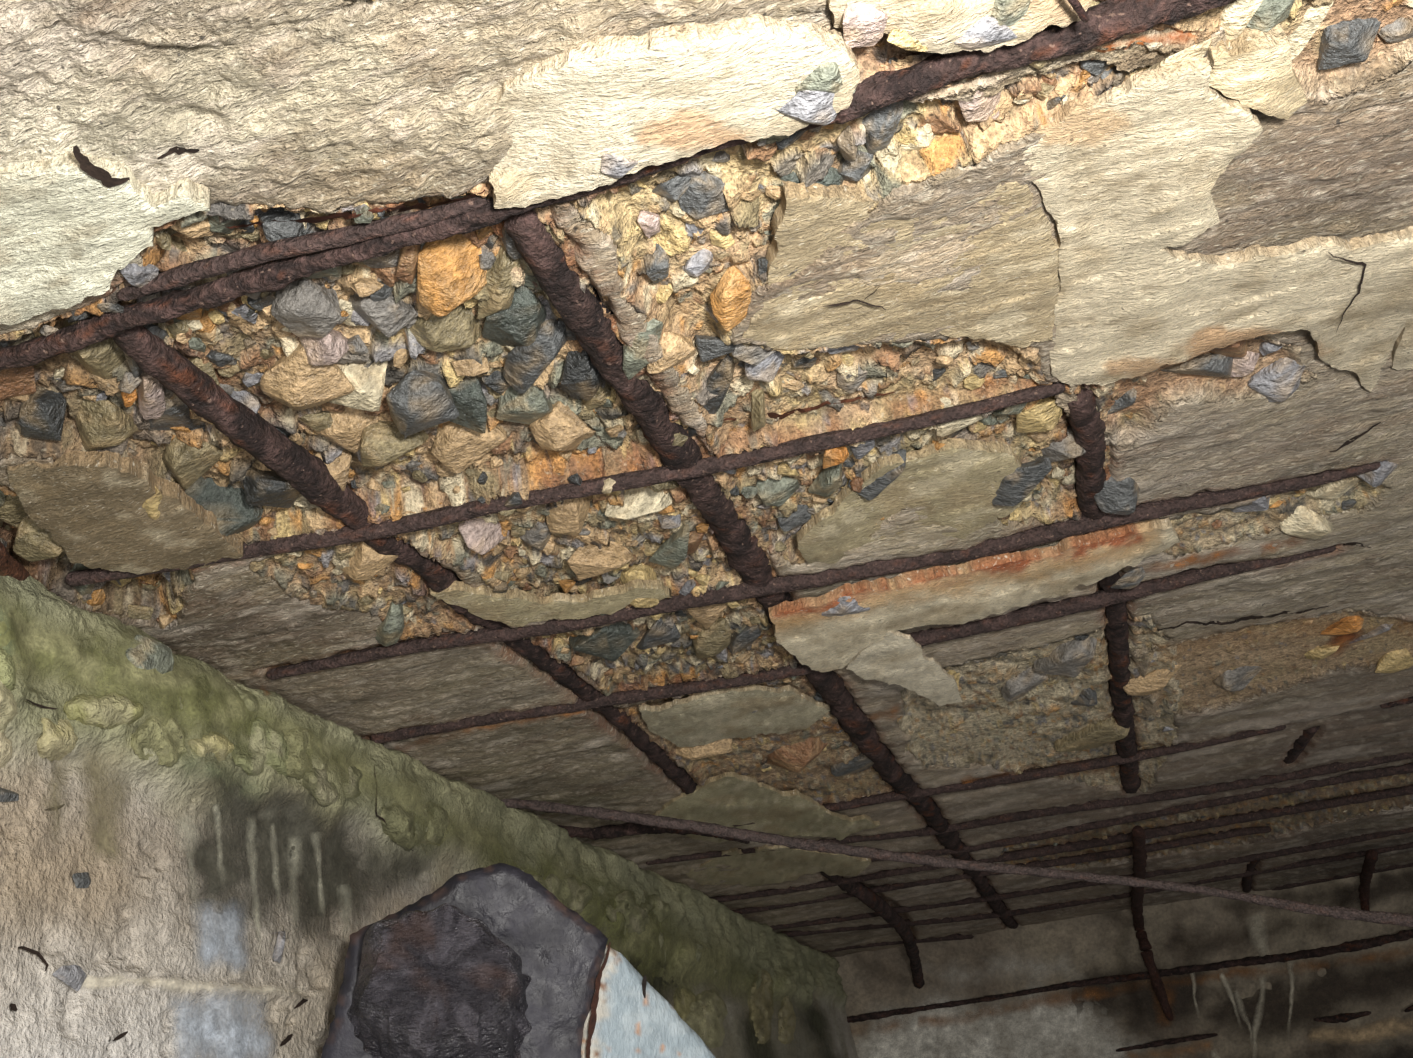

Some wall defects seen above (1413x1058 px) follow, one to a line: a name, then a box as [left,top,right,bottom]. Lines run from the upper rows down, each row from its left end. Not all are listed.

peeling [0,151,493,348]
crack [1328,252,1367,332]
spalling [0,338,345,629]
spalling [143,0,1413,887]
corrosion [1331,632,1358,649]
water stain [190,784,421,929]
water stain [83,977,300,992]
water stain [630,962,677,1000]
water stain [746,1019,773,1058]